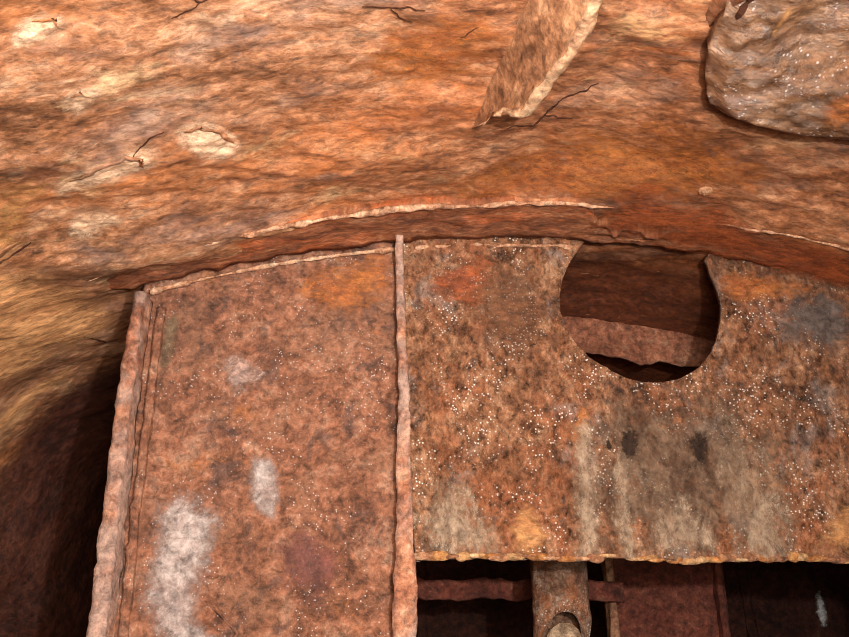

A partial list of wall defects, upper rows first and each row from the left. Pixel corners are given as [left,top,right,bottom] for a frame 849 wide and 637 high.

crack [172,0,208,19]
crack [362,6,425,23]
peeling [472,0,604,129]
crack [507,83,599,129]
corrosion [305,267,385,305]
corrosion [559,254,719,337]
water stain [0,270,132,382]
corrosion [587,354,679,382]
water stain [0,361,121,637]
water stain [575,397,786,559]
corrosion [514,510,545,547]
corrosion [827,509,849,546]